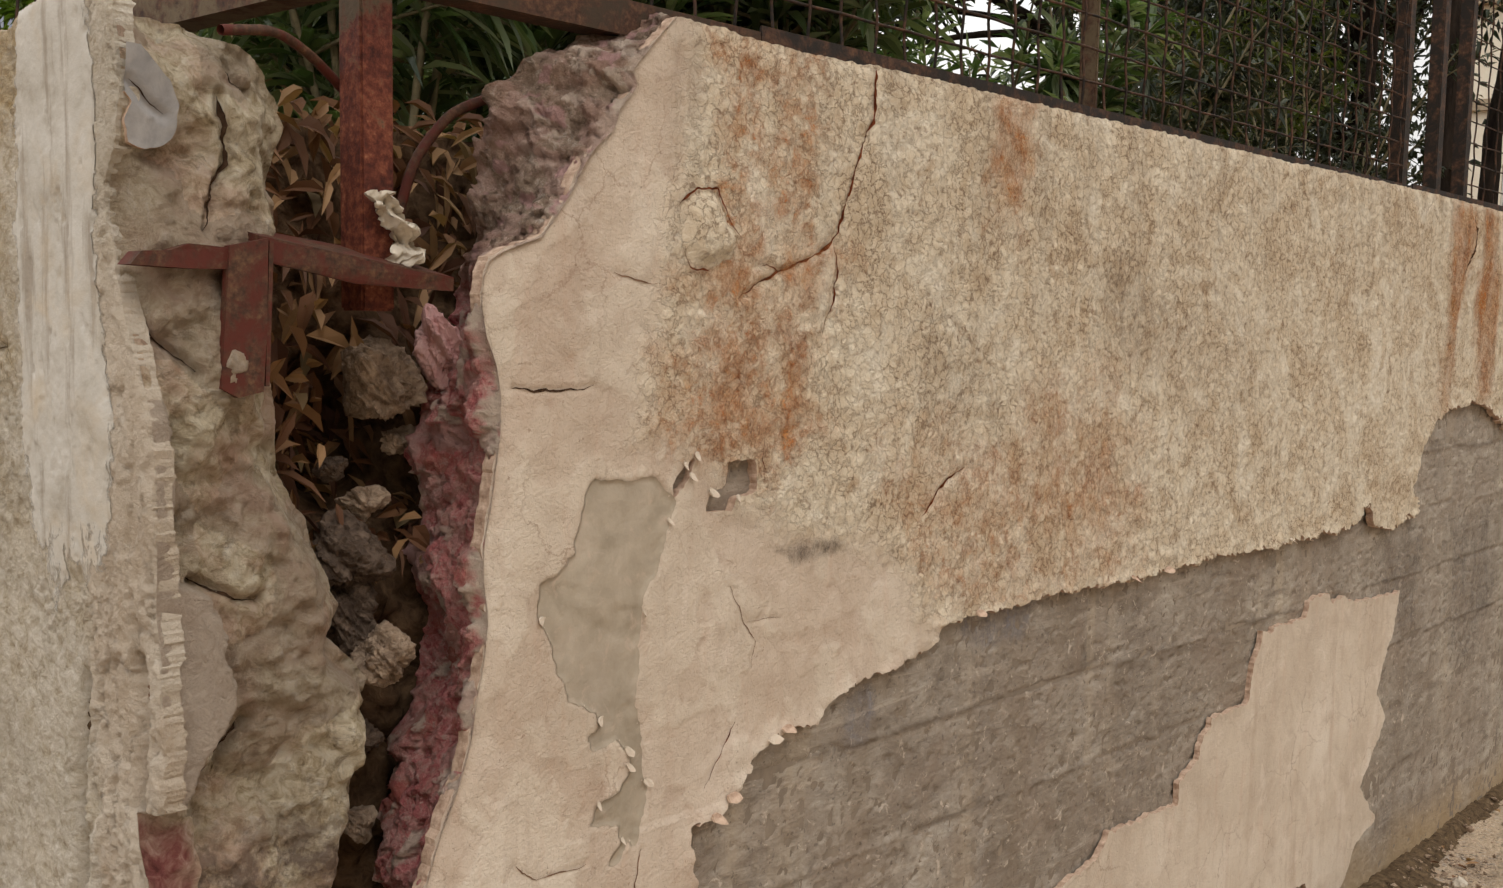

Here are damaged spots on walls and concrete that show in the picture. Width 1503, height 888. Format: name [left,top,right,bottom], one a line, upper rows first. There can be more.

crack [202,73,240,231]
spalling [110,15,366,888]
crack [512,385,593,393]
crack [614,272,663,285]
crack [739,70,878,333]
rust [1450,205,1499,391]
flaking render [691,404,1503,888]